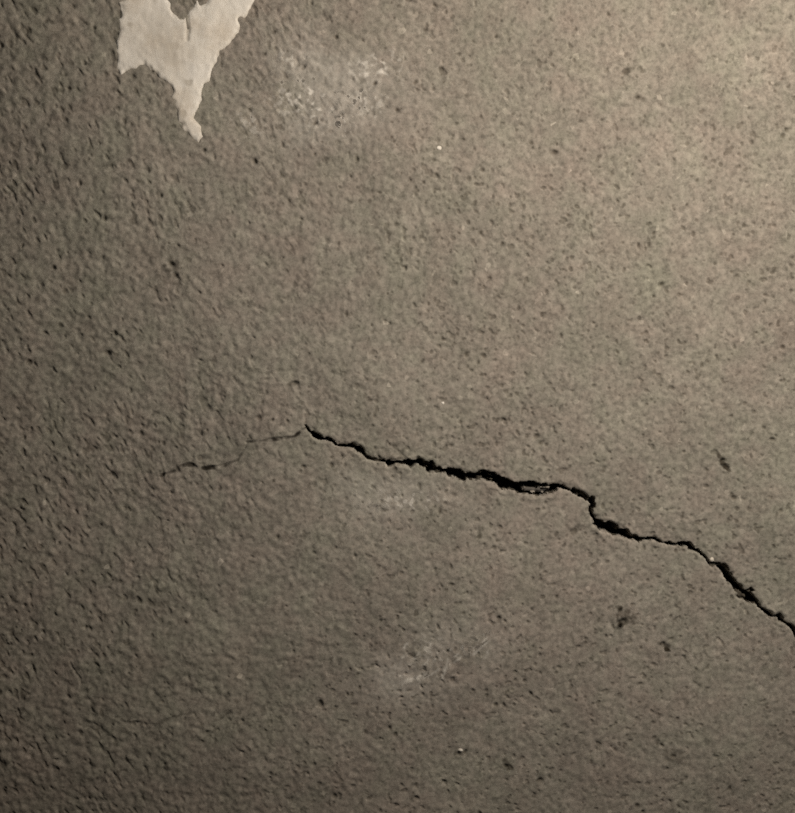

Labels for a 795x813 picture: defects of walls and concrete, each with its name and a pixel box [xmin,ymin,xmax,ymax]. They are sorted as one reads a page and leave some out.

flaking render [116,0,254,142]
crack [162,463,226,476]
crack [273,425,795,637]